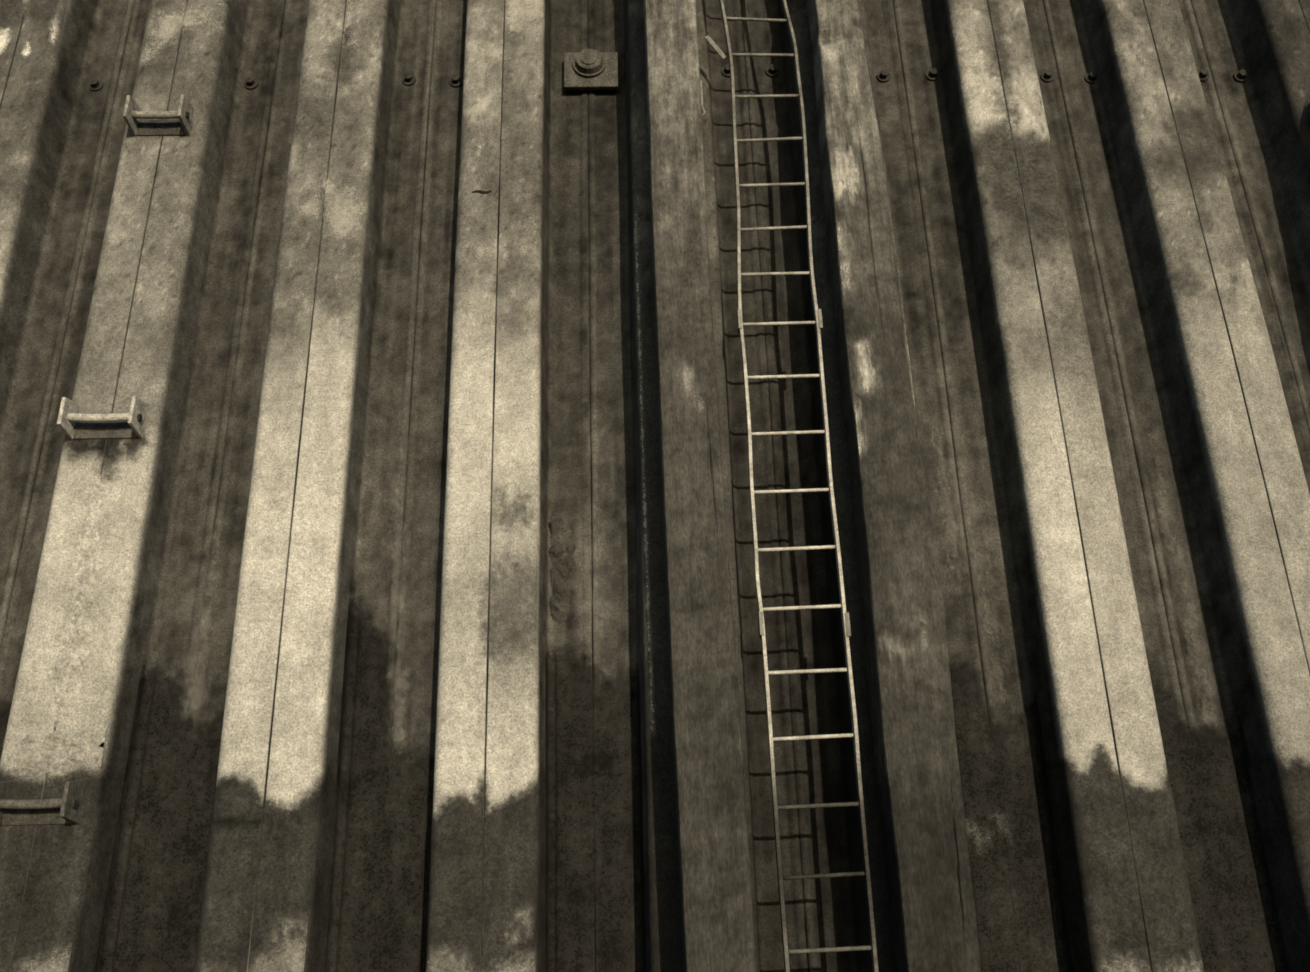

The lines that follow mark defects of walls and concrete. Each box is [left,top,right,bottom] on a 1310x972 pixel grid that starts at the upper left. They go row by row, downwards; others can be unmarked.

water stain [500,493,529,524]
water stain [483,562,537,655]
water stain [0,769,128,972]
water stain [194,775,338,972]
water stain [425,774,546,972]
water stain [1046,744,1204,972]
water stain [1247,755,1310,972]